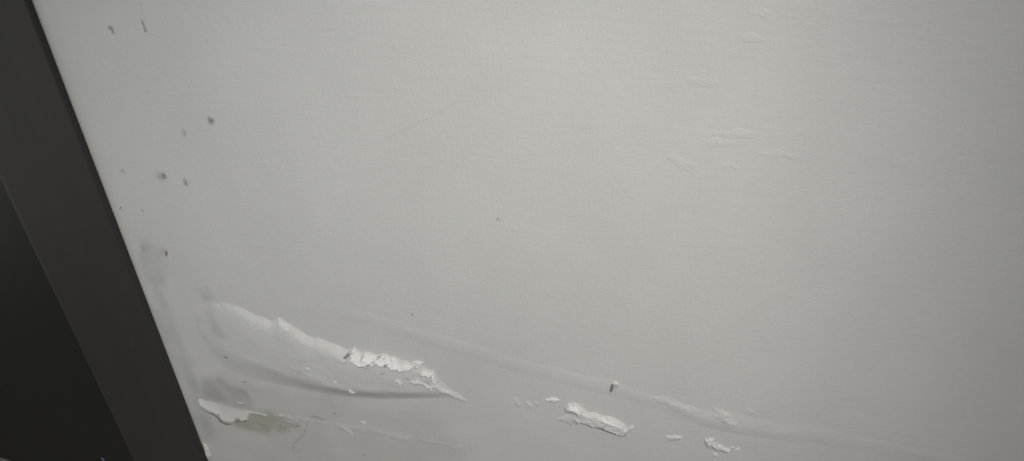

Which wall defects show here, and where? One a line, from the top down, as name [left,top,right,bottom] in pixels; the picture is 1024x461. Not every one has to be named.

peeling [198,398,285,425]
peeling [543,397,634,436]